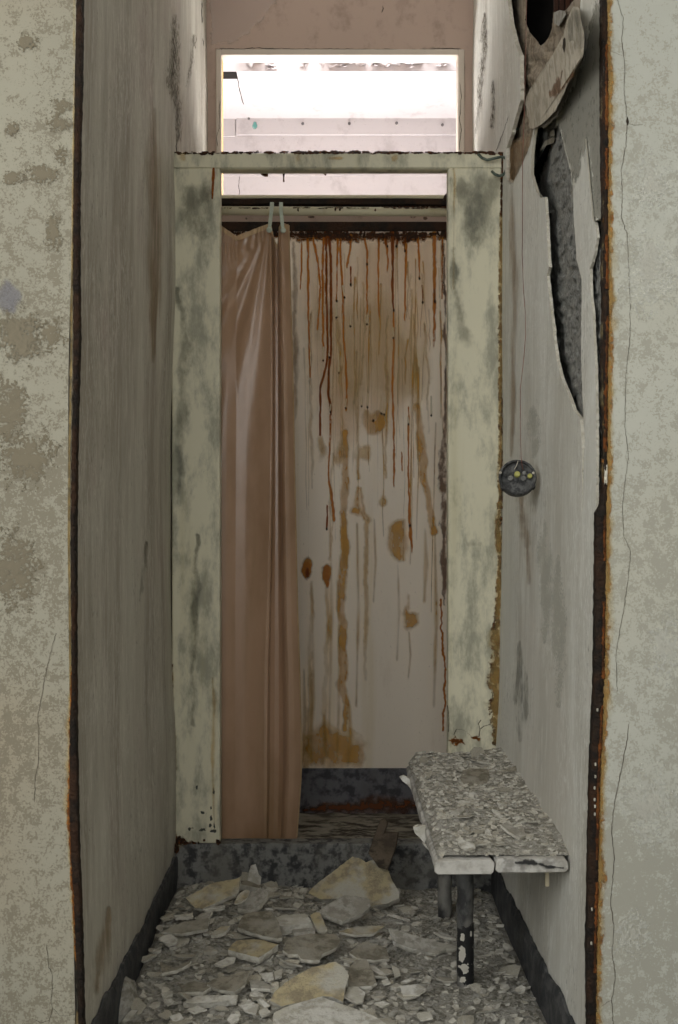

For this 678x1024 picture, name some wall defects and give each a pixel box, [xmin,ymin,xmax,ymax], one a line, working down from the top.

leakage [305,430,367,764]
rust [174,150,503,746]
spalling [510,0,602,495]
rust [596,0,615,1024]
crack [604,725,629,1024]